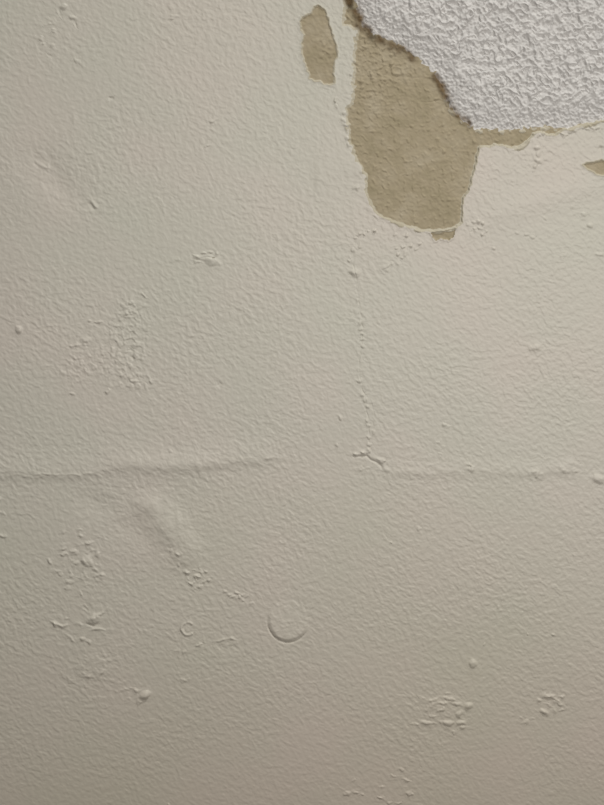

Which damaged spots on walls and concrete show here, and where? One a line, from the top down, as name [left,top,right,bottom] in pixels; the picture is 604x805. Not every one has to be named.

spalling [296,0,604,250]
crack [346,240,378,451]